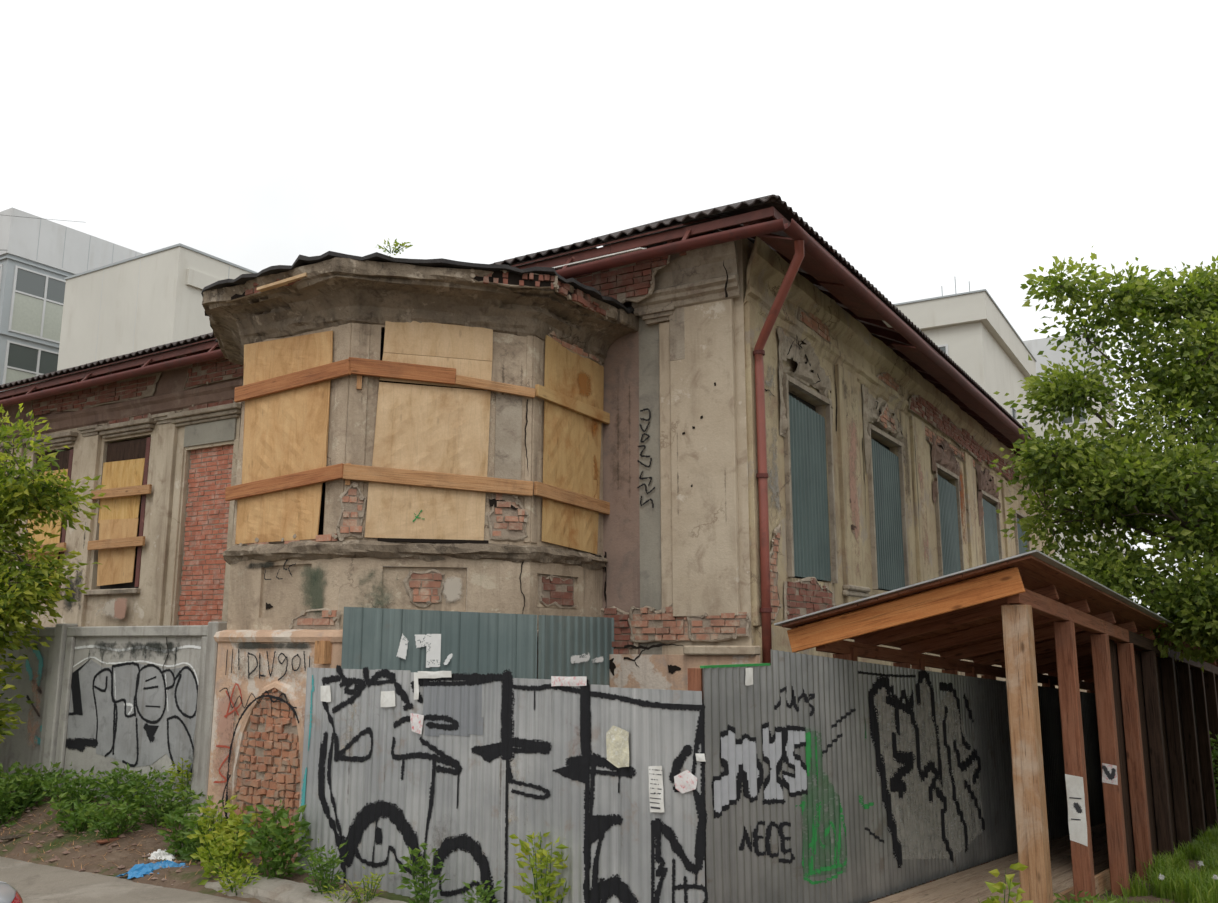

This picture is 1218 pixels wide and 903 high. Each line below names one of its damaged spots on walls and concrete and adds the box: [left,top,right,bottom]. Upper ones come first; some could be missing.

flaking render [777,307,833,437]
flaking render [862,372,1020,526]
flaking render [238,481,367,547]
flaking render [486,493,529,542]
flaking render [403,568,462,609]
flaking render [538,574,577,609]
flaking render [770,524,835,625]
flaking render [289,608,341,630]
flaking render [601,603,751,654]